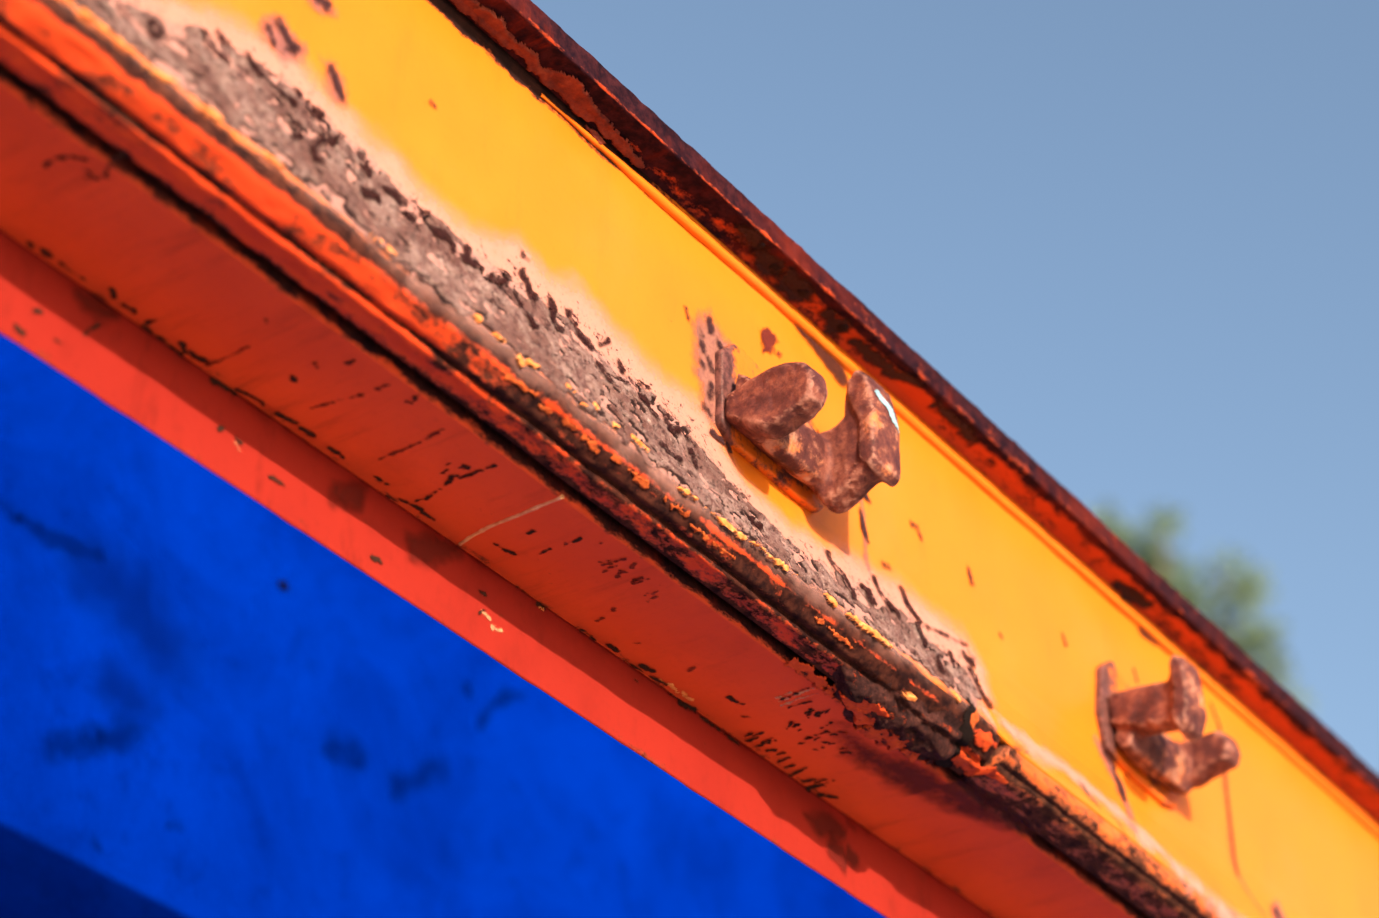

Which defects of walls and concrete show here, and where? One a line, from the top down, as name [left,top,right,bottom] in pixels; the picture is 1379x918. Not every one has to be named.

peeling [451,0,645,169]
spalling [109,287,345,459]
corrosion [73,0,994,709]
peeling [502,354,650,489]
spalling [374,463,497,521]
spalling [663,486,798,575]
spalling [478,590,503,632]
spalling [814,593,893,649]
spalling [580,629,852,799]
peeling [951,690,1008,785]
corrosion [1095,736,1135,830]
corrosion [1224,773,1240,877]